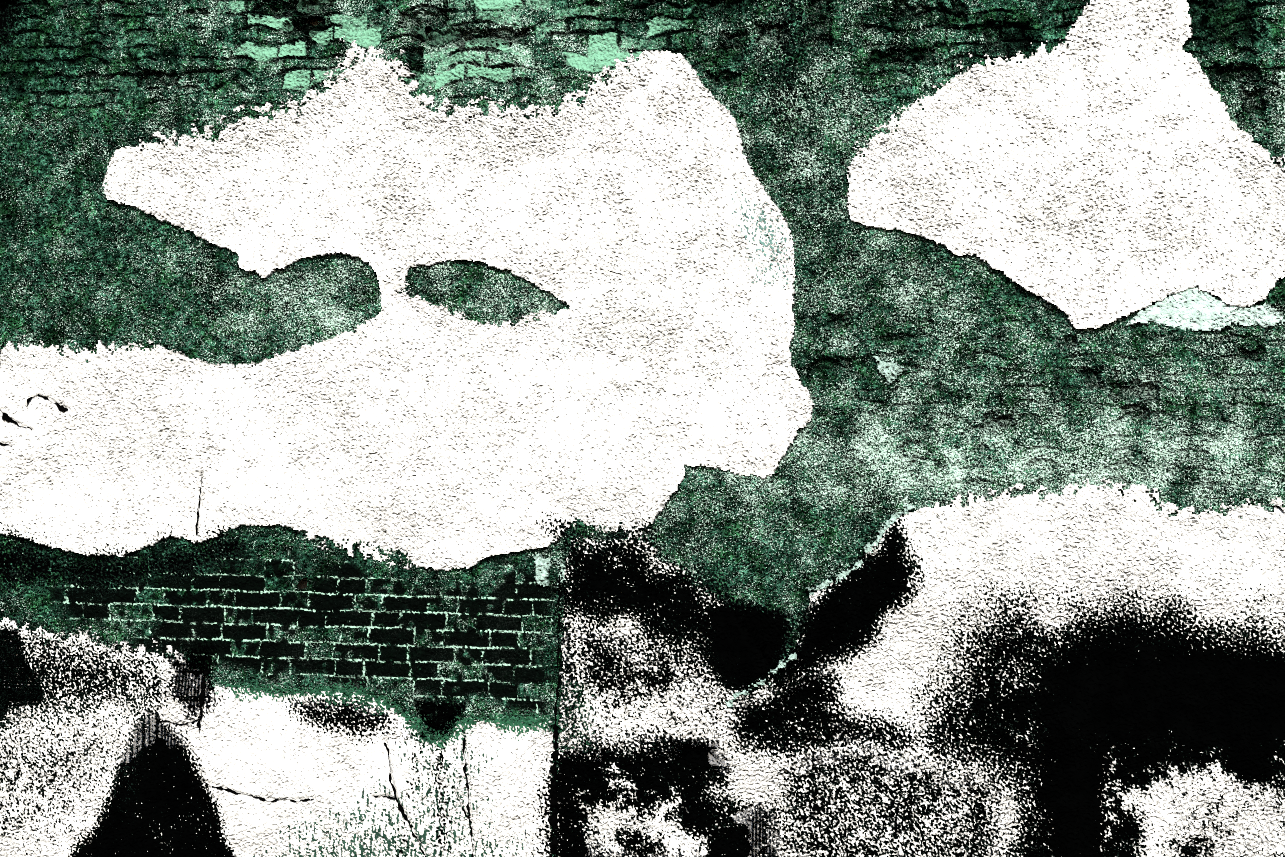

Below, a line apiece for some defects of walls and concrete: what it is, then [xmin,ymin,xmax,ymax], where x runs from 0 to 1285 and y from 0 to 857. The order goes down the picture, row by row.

flaking render [0,0,1090,367]
flaking render [1182,0,1285,173]
crack [0,394,68,446]
flaking render [0,233,1285,743]